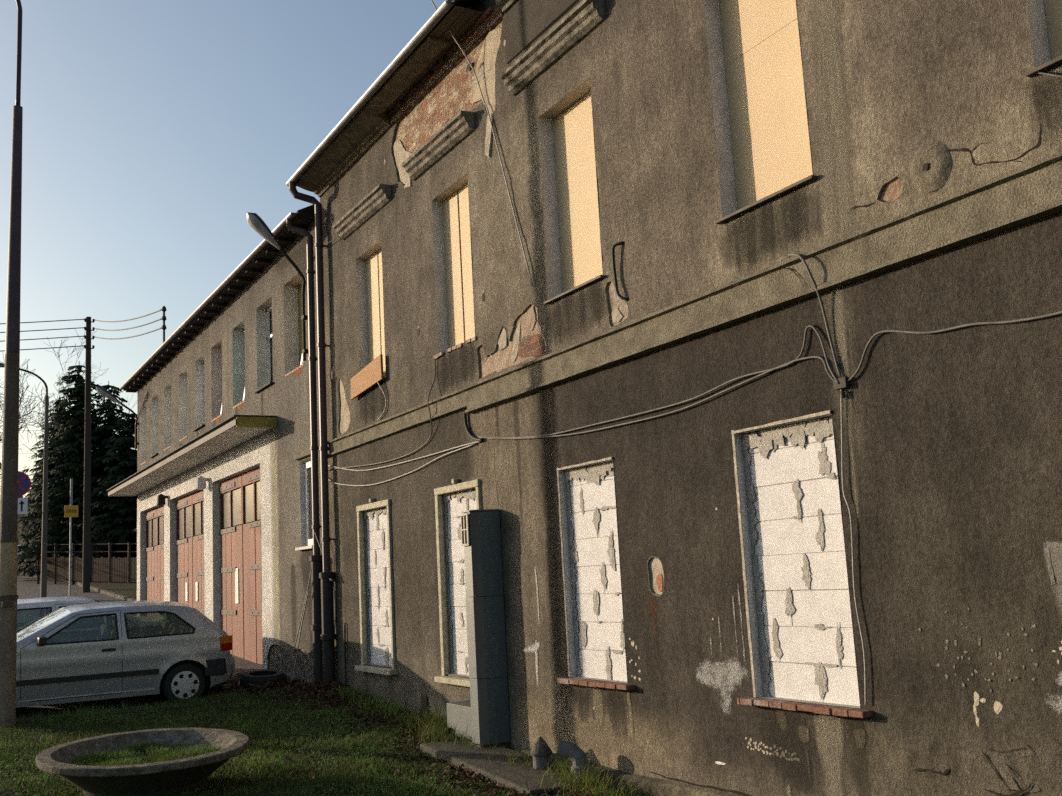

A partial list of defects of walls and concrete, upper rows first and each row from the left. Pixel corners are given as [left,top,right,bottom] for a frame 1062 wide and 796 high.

flaking render [384,14,506,189]
crack [949,124,1041,166]
flaking render [876,175,905,204]
flaking render [477,303,547,380]
flaking render [647,556,664,596]
spalling [1043,541,1062,613]
crack [650,772,751,796]
crack [913,767,951,775]
crack [982,746,1032,796]